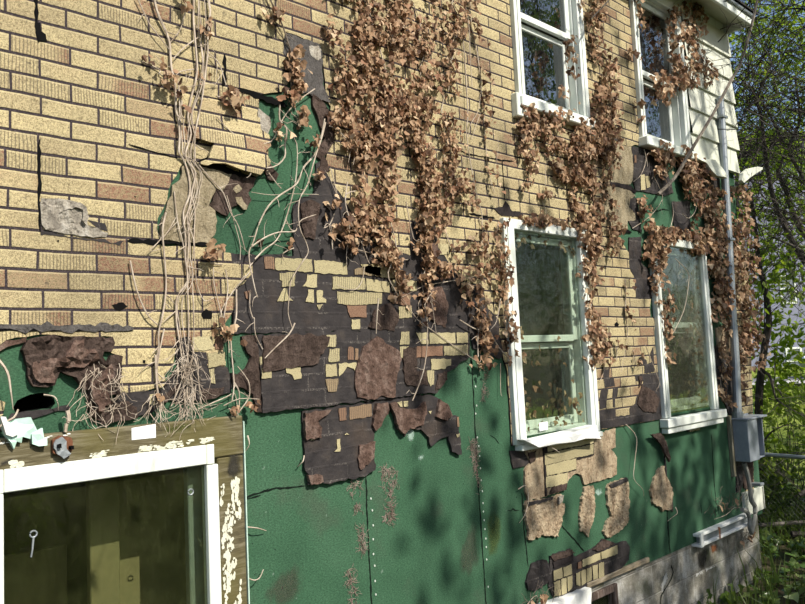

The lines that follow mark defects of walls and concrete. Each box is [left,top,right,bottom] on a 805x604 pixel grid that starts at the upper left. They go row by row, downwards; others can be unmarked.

peeling [283,33,331,103]
peeling [215,170,247,210]
peeling [598,144,650,233]
peeling [264,257,417,329]
peeling [192,336,226,384]
peeling [325,335,358,392]
peeling [399,331,468,386]
peeling [45,433,71,458]
peeling [545,438,595,488]
crack [247,485,304,499]
peeling [220,477,242,604]
peeling [553,545,618,597]